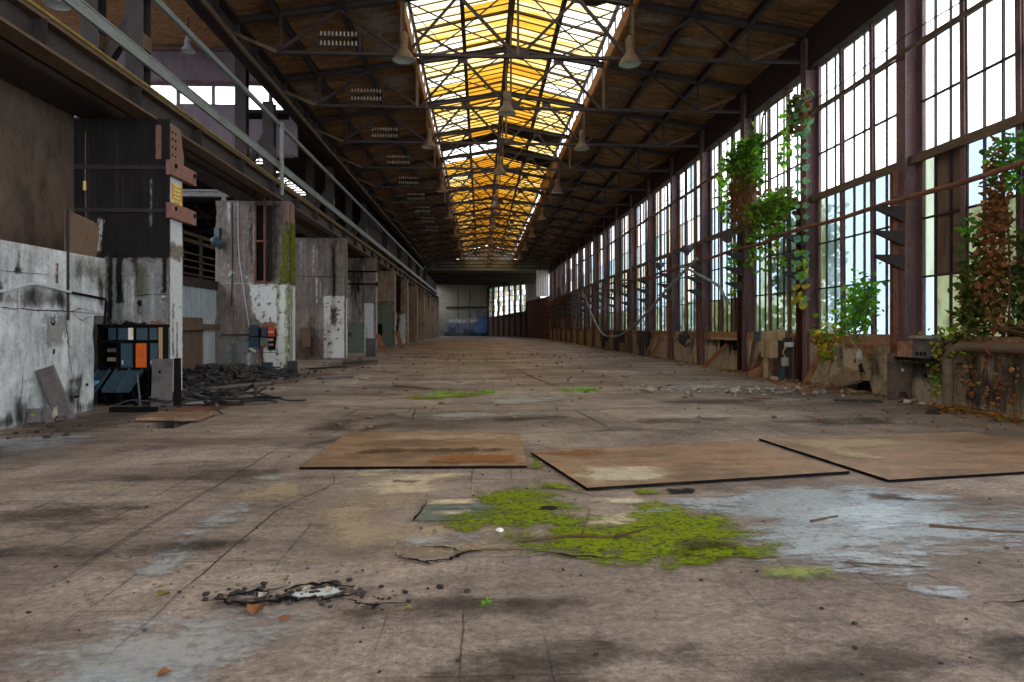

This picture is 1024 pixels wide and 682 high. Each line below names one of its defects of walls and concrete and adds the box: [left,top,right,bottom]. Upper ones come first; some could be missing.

water stain [57,292,76,347]
water stain [99,244,183,324]
peeling [229,272,290,369]
water stain [267,205,293,368]
spalling [200,581,361,606]
crack [412,498,464,521]
crack [392,546,604,565]
water stain [650,484,1024,597]